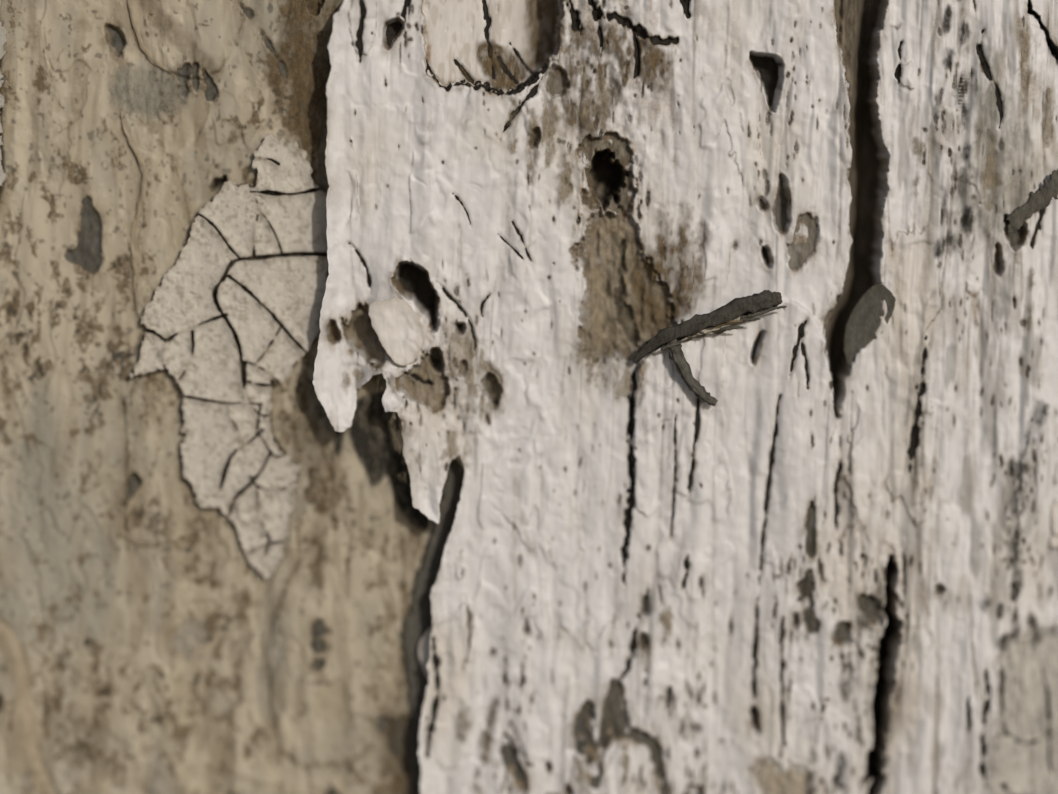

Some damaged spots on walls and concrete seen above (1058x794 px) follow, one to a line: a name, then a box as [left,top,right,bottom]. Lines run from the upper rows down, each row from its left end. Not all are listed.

crack [426,0,553,132]
crack [566,0,691,78]
crack [895,41,903,83]
peeling [65,197,102,274]
peeling [129,134,329,580]
spalling [347,306,385,364]
spalling [402,356,444,411]
spalling [579,149,787,406]
crack [1030,209,1045,249]
crack [621,363,637,583]
spalling [573,679,668,794]
crack [966,667,1053,794]